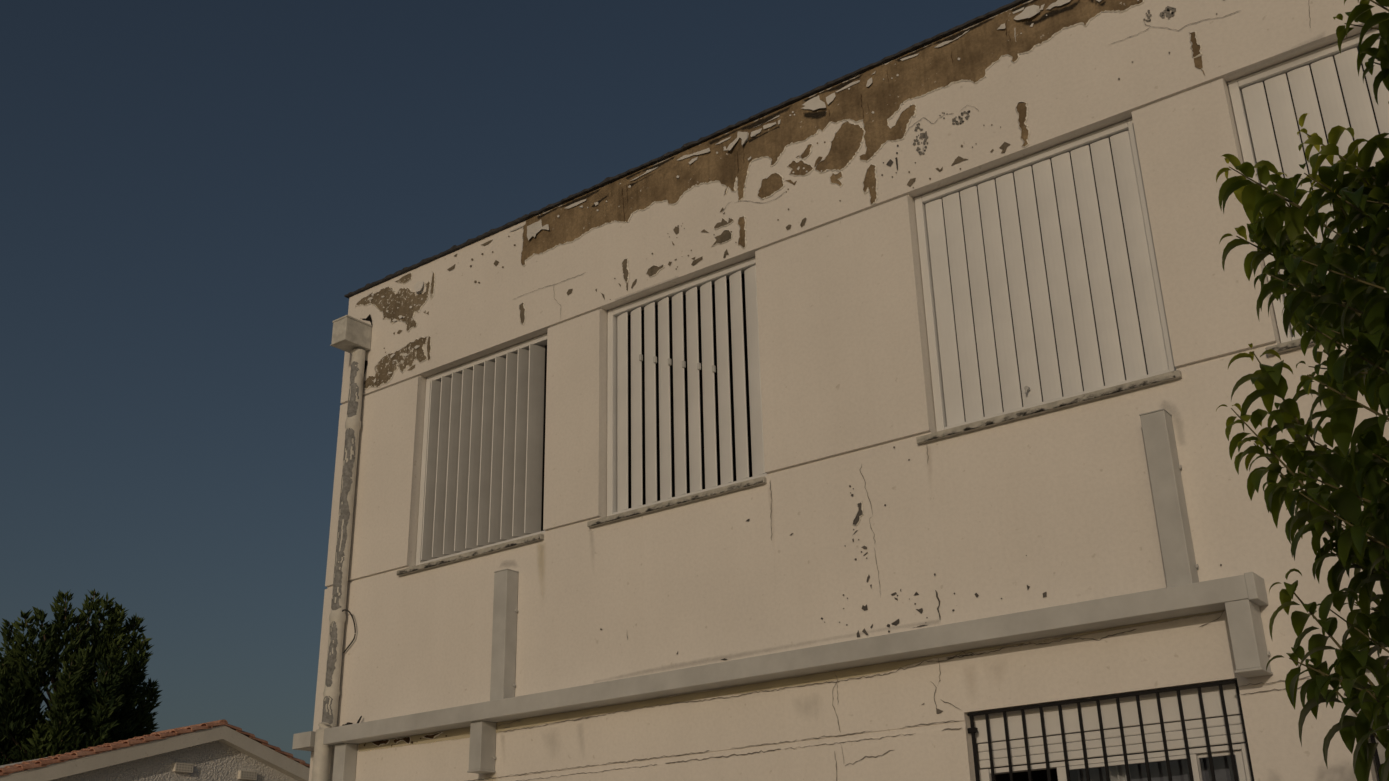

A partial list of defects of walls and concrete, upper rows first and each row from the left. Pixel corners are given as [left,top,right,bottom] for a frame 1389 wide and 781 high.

peeling [1189,31,1205,75]
peeling [322,0,1176,725]
crack [468,629,1136,781]
crack [1240,673,1333,695]